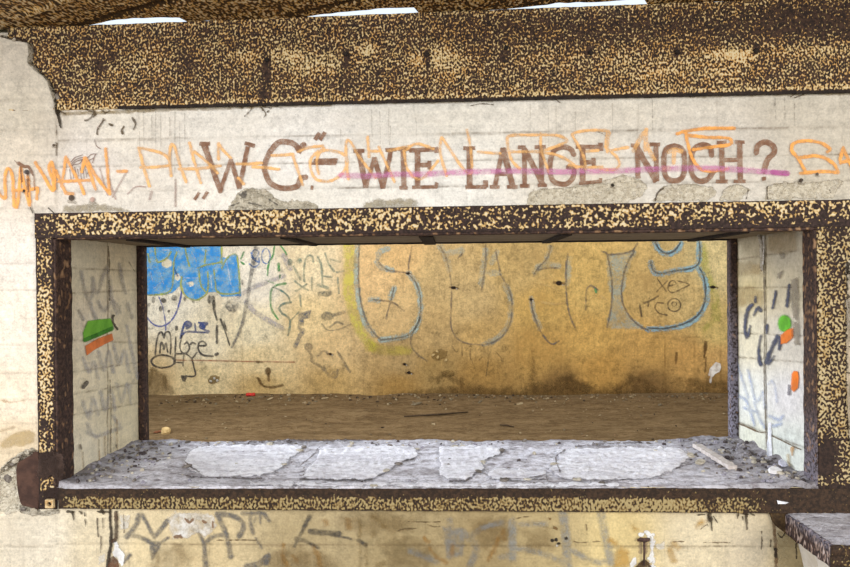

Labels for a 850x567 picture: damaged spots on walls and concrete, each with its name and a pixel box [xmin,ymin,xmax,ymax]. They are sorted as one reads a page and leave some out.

spalling [0,35,61,126]
spalling [364,199,415,208]
spalling [526,174,647,205]
spalling [653,183,750,202]
spalling [765,173,843,200]
crack [185,461,262,480]
crack [232,438,360,465]
crack [500,441,640,479]